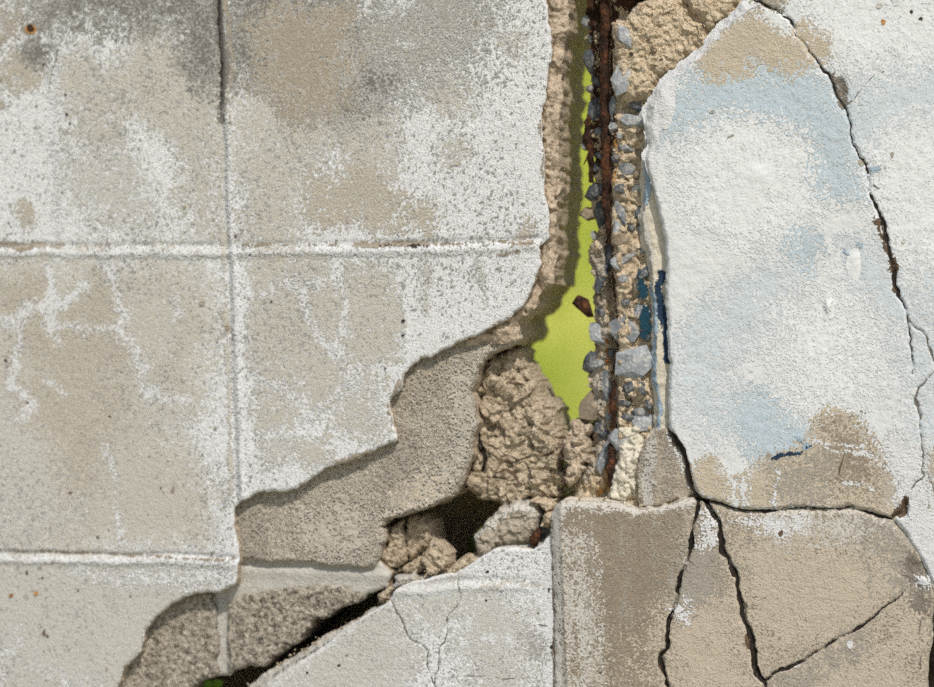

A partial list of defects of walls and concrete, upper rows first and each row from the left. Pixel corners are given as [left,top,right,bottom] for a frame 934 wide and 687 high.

rust [589,0,645,104]
rust [591,109,618,182]
peeling [511,212,543,252]
rust [605,238,619,318]
spalling [573,0,654,498]
crack [753,0,934,491]
peeling [0,0,489,687]
rust [605,337,619,374]
crack [658,430,903,687]
peeling [268,570,553,687]
crack [391,581,519,686]
crack [524,567,555,687]